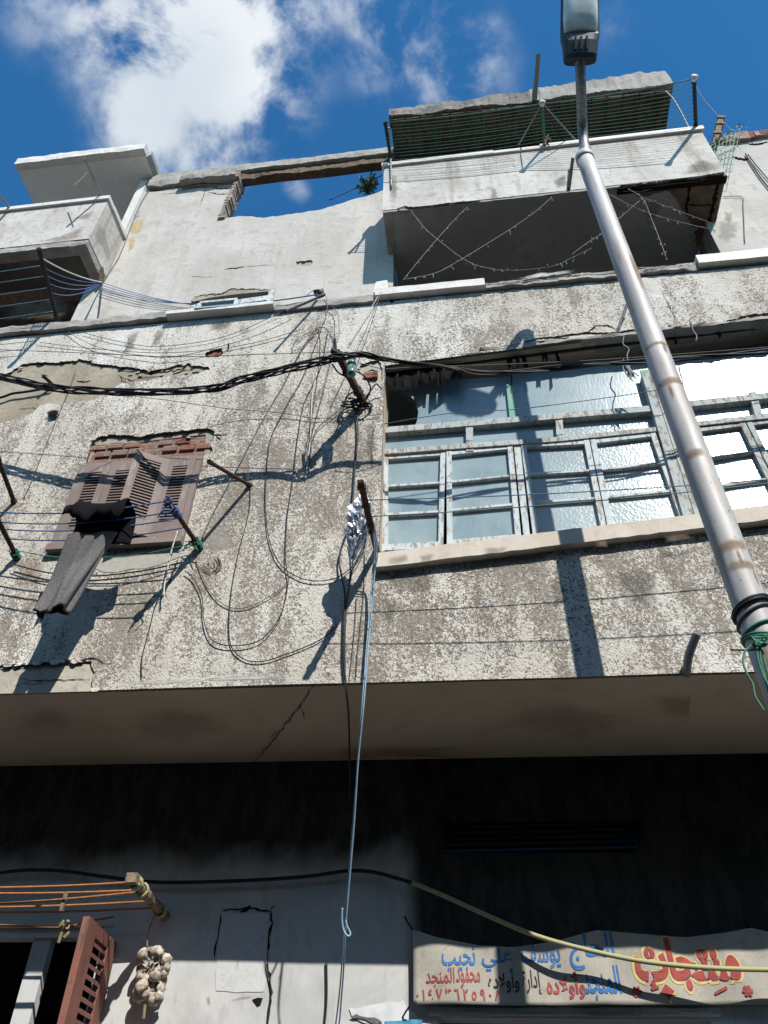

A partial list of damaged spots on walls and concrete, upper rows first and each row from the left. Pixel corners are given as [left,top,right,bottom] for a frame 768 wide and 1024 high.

spalling [179,168,243,220]
spalling [191,288,275,302]
spalling [0,349,223,423]
spalling [89,427,212,463]
spalling [0,659,100,694]
crack [257,683,316,759]